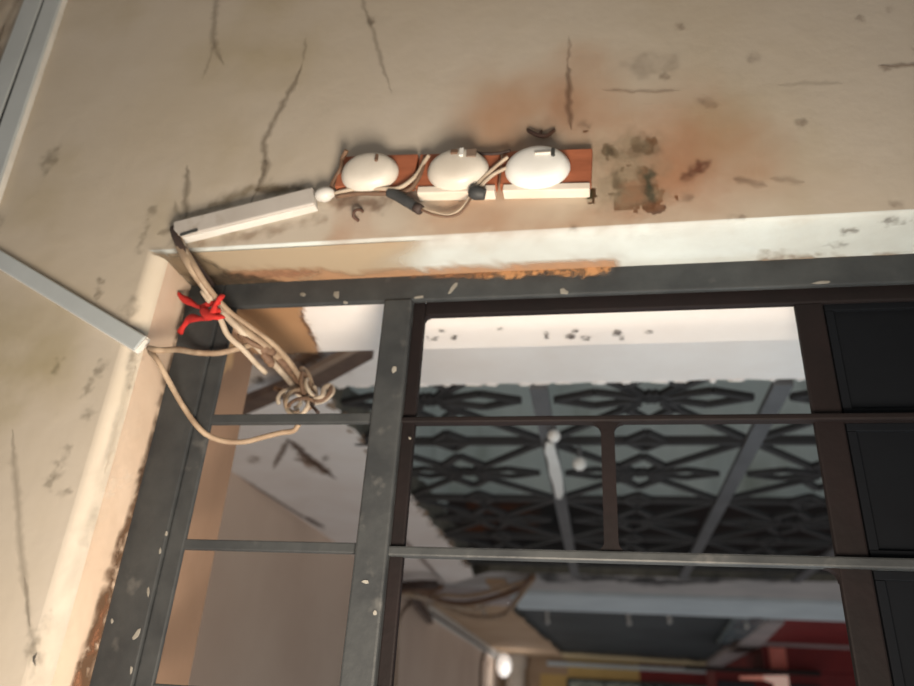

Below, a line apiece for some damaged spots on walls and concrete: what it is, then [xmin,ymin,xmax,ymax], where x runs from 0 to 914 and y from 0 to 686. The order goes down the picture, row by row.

peeling [227,260,617,294]
peeling [236,307,318,354]
spalling [72,420,156,686]